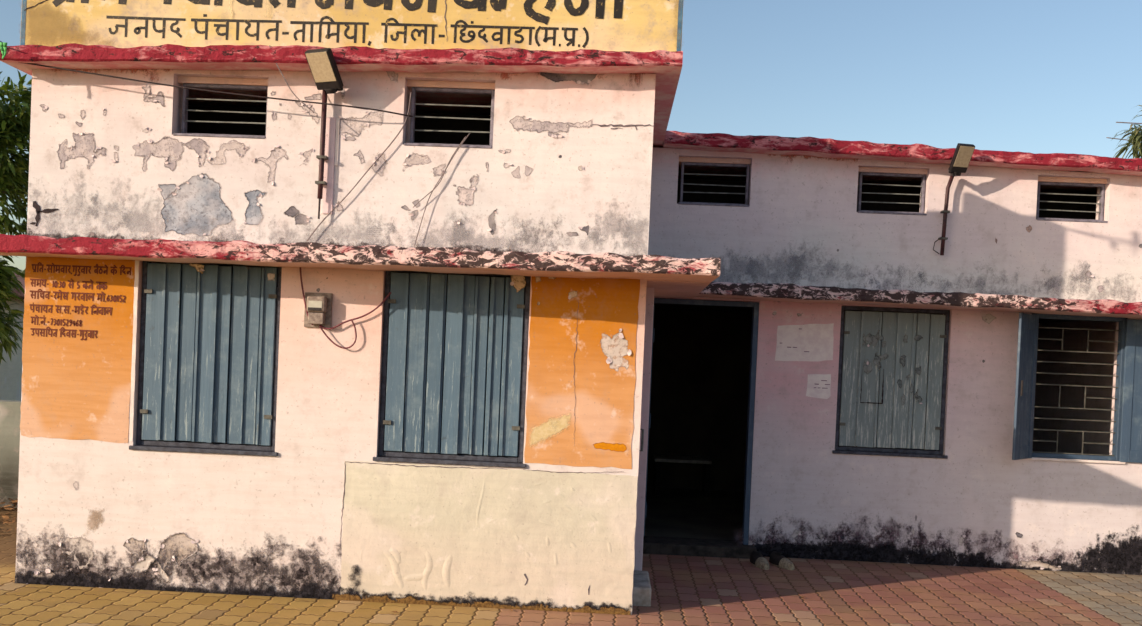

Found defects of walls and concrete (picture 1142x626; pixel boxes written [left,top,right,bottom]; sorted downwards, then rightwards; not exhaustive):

peeling [142,84,165,107]
peeling [40,104,314,236]
peeling [338,111,387,176]
peeling [403,153,446,176]
peeling [453,162,488,206]
peeling [498,149,533,178]
peeling [509,116,592,138]
peeling [401,199,420,220]
peeling [487,209,497,235]
peeling [600,329,632,371]
damp [742,519,1142,575]
damp [15,533,632,615]